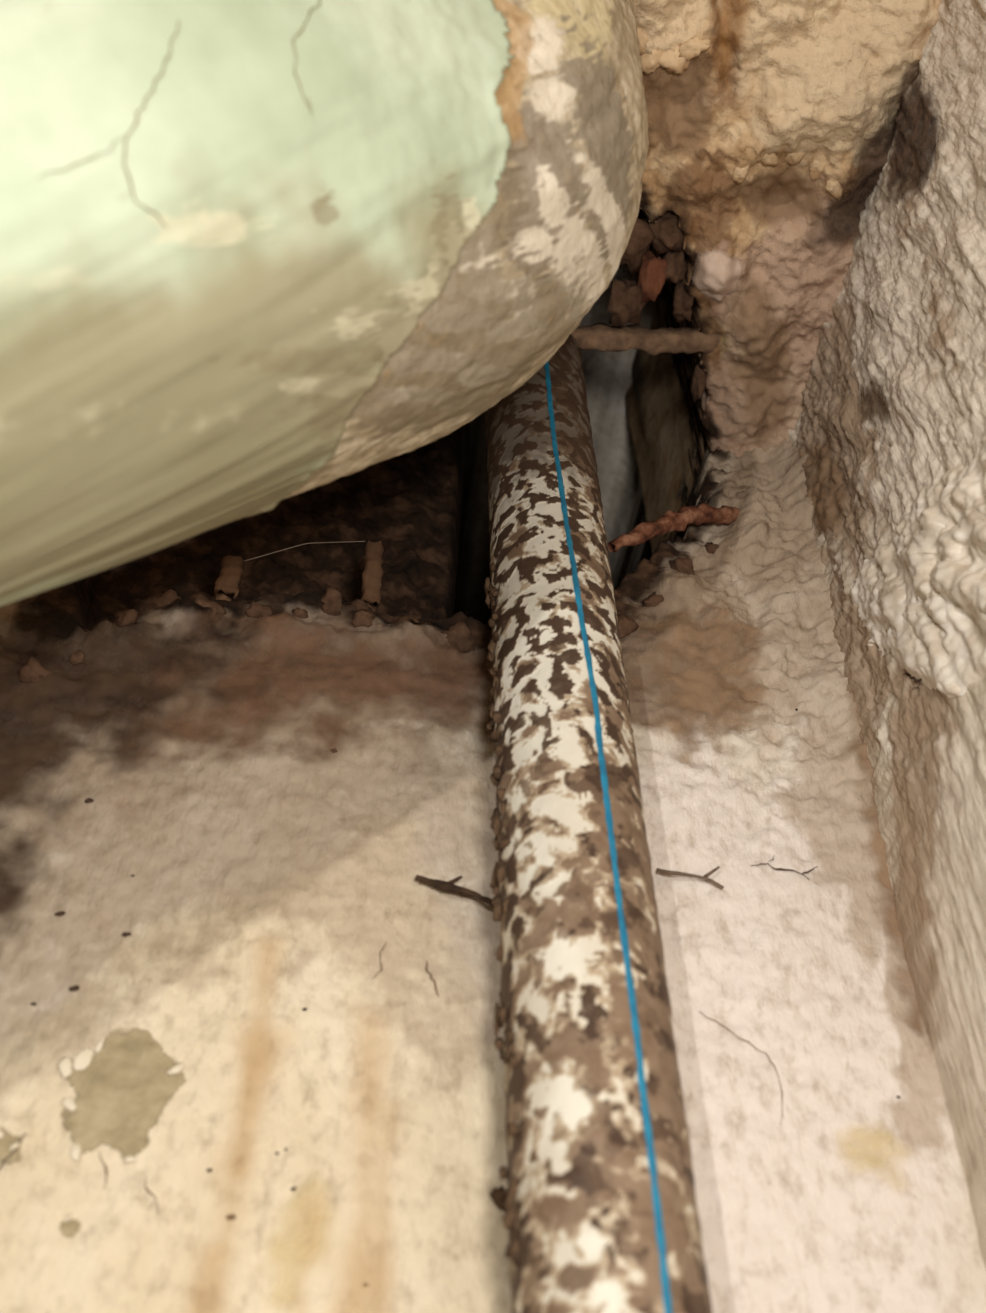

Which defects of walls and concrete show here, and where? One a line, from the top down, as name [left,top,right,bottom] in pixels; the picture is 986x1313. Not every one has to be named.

crack [38,20,179,228]
crack [292,0,321,115]
peeling [58,1028,186,1163]